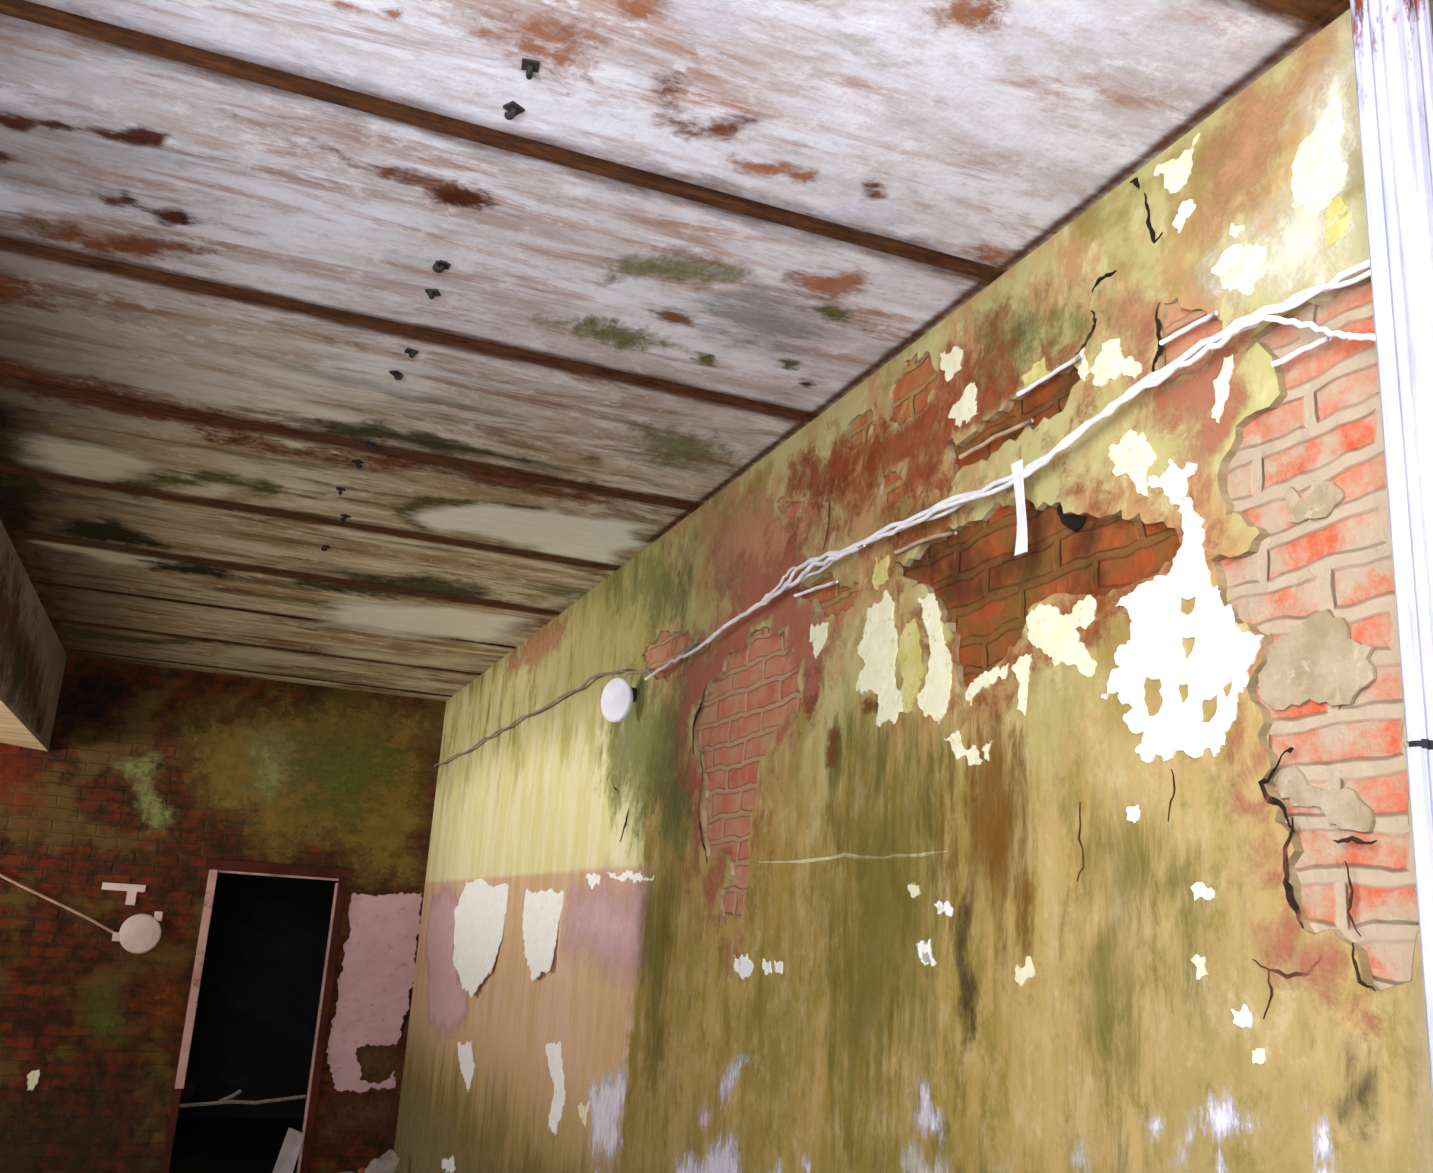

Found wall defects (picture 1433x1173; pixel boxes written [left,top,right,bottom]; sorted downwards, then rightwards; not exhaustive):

water stain [0,112,73,132]
water stain [93,128,169,146]
crack [1130,178,1163,243]
crack [1075,270,1116,355]
crack [1151,302,1164,372]
flaking render [691,276,1419,990]
crack [1258,747,1304,928]
peeling [177,685,646,1093]
crack [1252,836,1377,1019]
peeling [545,1041,590,1135]
water stain [588,1067,627,1173]
water stain [1179,1096,1251,1173]